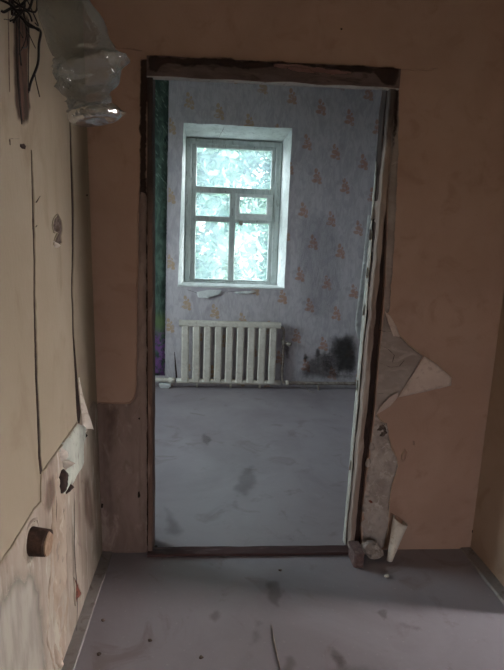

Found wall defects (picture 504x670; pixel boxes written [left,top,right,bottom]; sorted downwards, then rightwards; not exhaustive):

peeling [0,178,148,670]
damp [304,337,355,376]
peeling [361,90,452,562]